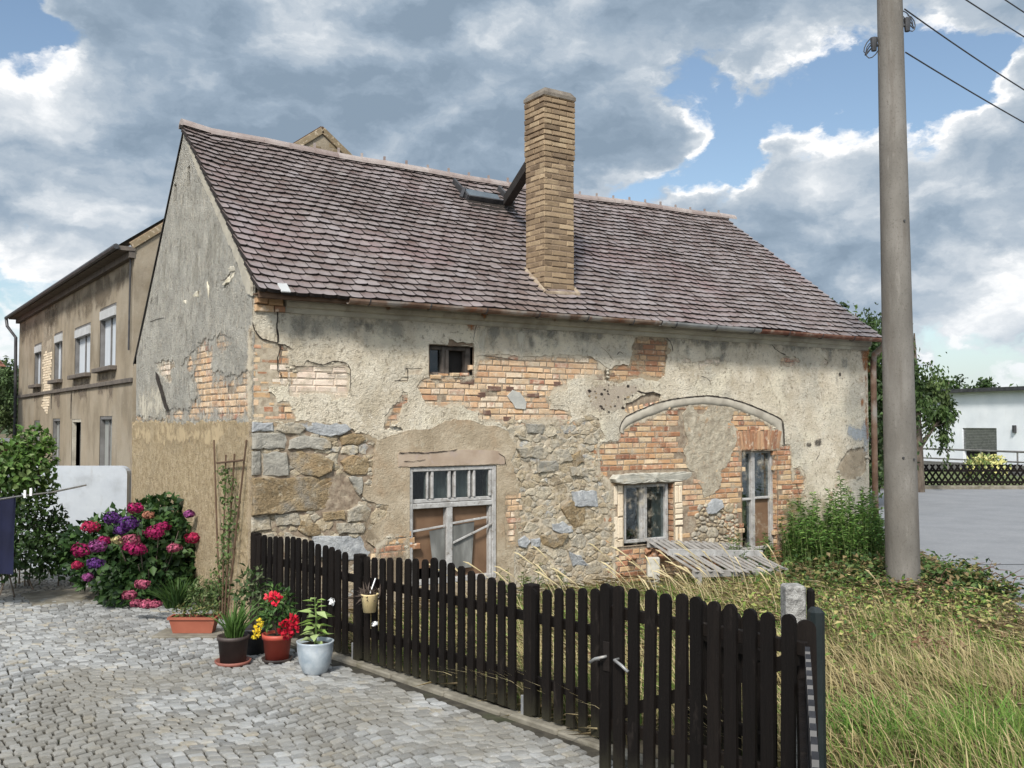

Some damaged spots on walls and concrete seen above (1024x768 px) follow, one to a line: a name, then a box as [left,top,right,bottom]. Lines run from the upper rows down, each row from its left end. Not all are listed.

spalling [41,317,54,414]
crack [155,372,168,424]
crack [252,312,351,387]
spalling [136,298,806,622]